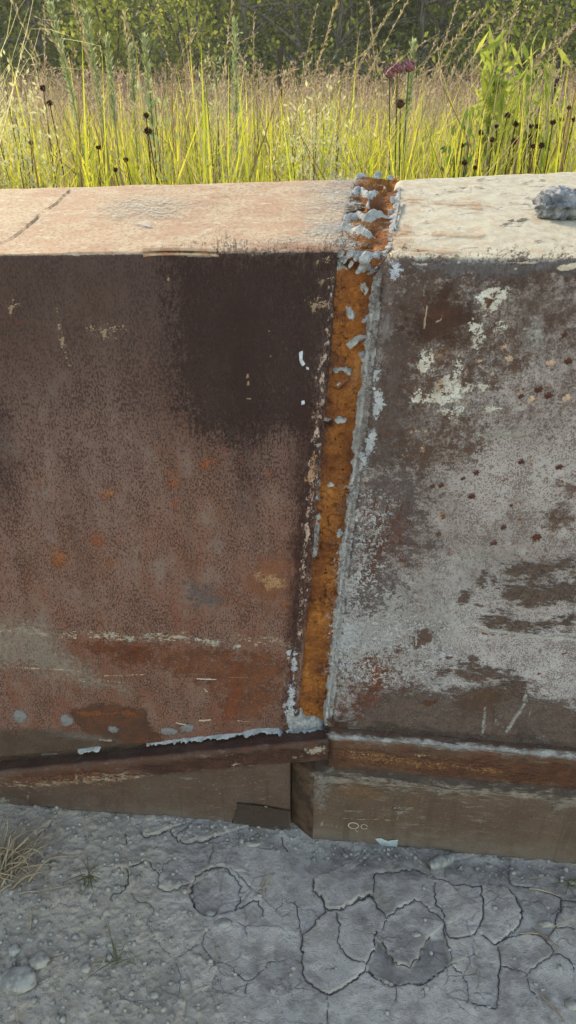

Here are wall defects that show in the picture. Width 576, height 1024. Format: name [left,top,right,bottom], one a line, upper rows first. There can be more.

peeling [401,245,576,421]
spalling [282,171,400,724]
corrosion [329,197,576,726]
damp [324,569,417,681]
corrosion [71,703,163,748]
corrosion [71,637,288,726]
damp [330,732,576,759]